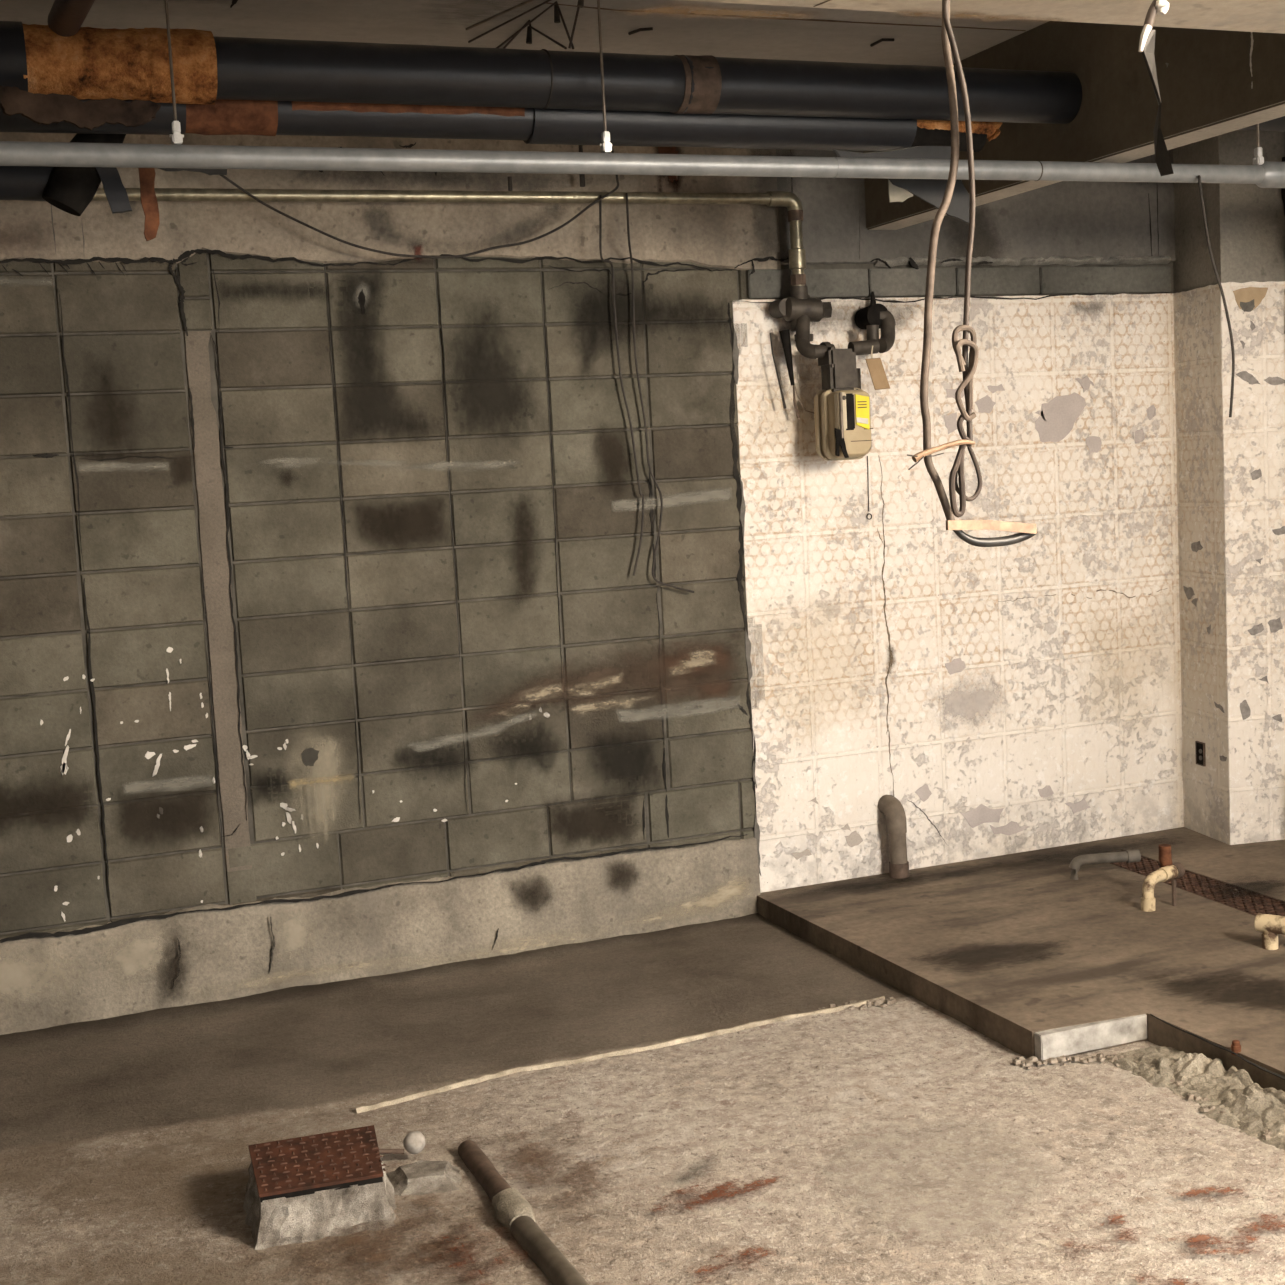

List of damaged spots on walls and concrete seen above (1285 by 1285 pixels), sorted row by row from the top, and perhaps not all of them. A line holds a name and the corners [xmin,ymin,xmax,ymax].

damp [357,285,368,315]
spalling [1236,371,1285,385]
peeling [944,384,1005,434]
peeling [1035,376,1094,443]
spalling [1248,617,1283,635]
crack [877,455,946,843]
peeling [915,784,932,802]
peeling [960,804,1029,835]
damp [612,863,637,887]
crack [0,834,747,974]
damp [517,878,551,909]
damp [113,939,186,994]